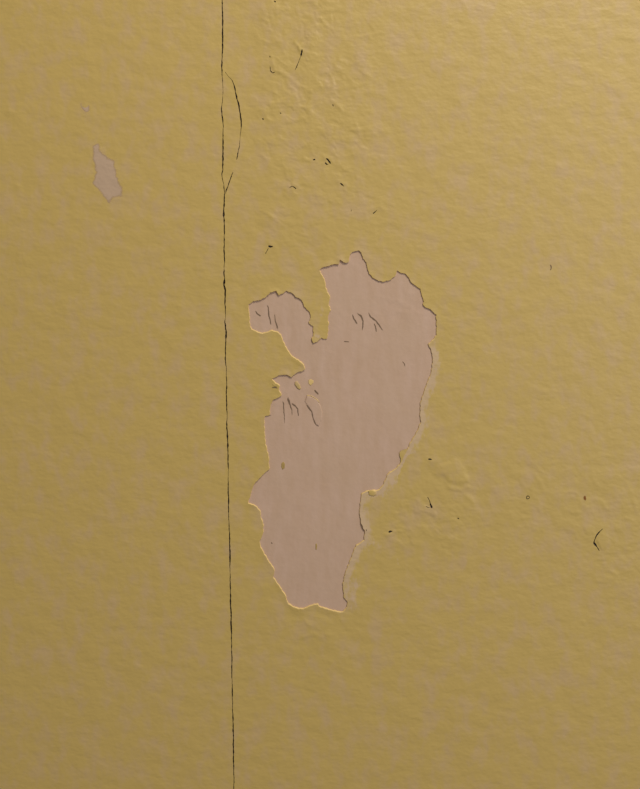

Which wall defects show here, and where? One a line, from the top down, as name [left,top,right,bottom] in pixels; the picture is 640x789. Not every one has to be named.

crack [221,1,242,789]
peeling [248,250,437,613]